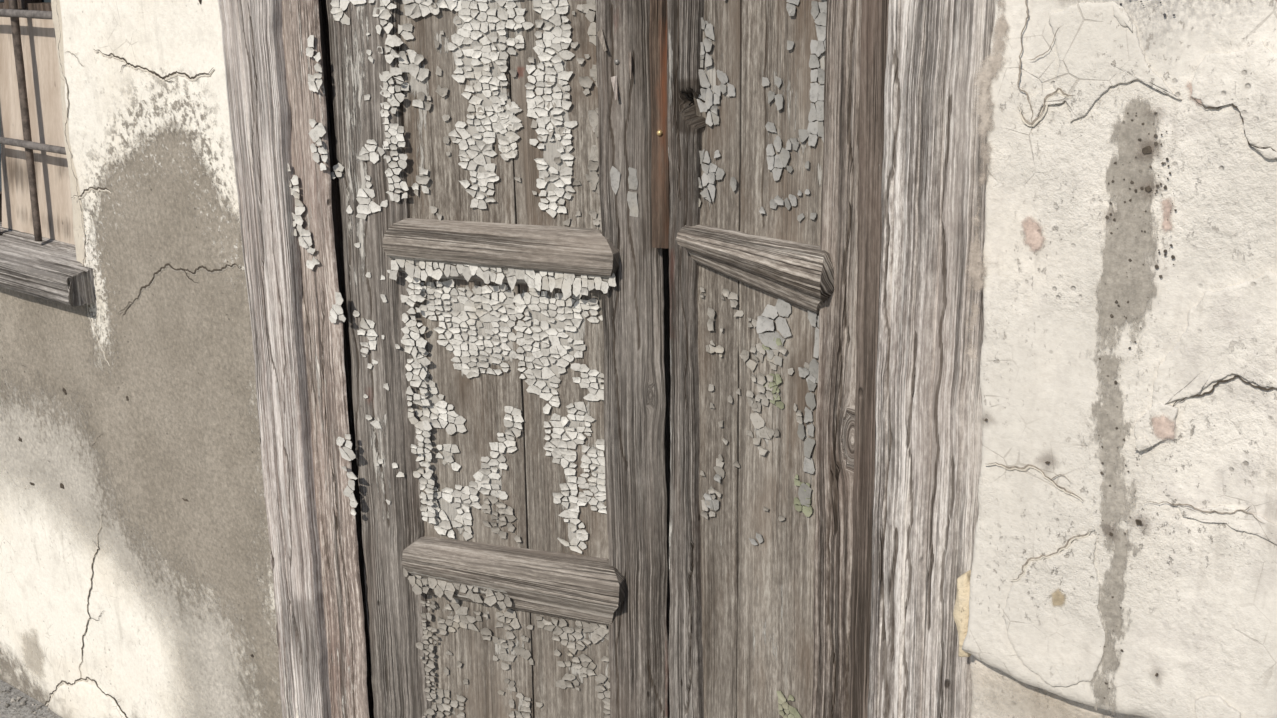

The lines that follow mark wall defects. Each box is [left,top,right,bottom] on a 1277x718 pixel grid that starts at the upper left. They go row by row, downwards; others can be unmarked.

crack [56,0,215,266]
spalling [976,0,1009,186]
crack [1017,0,1074,127]
flaking render [1028,1,1277,159]
spalling [1022,217,1044,251]
crack [87,263,242,366]
leakage [1090,96,1178,713]
flaking render [1134,270,1277,452]
crack [1173,375,1277,407]
flaking render [1176,503,1277,544]
crack [45,514,127,718]
flaking render [1002,532,1105,687]